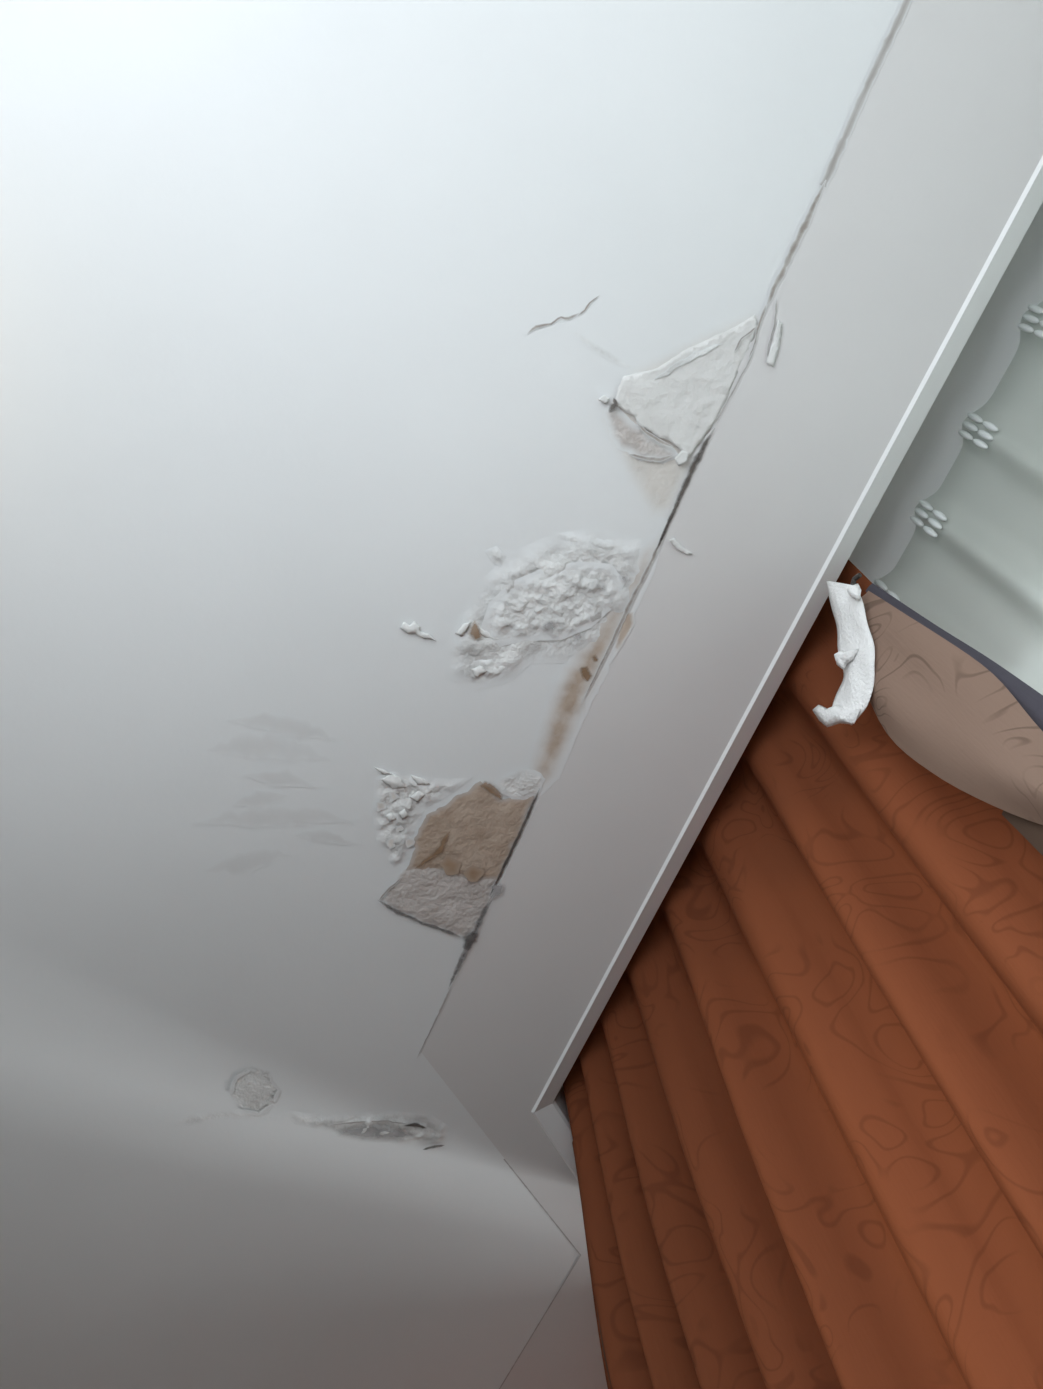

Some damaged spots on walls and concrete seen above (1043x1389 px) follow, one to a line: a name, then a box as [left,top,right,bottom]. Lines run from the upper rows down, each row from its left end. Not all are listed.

crack [527,295,632,371]
peeling [597,307,782,519]
crack [581,0,912,704]
water stain [527,526,665,797]
peeling [371,767,545,939]
crack [492,795,537,891]
crack [417,985,452,1057]